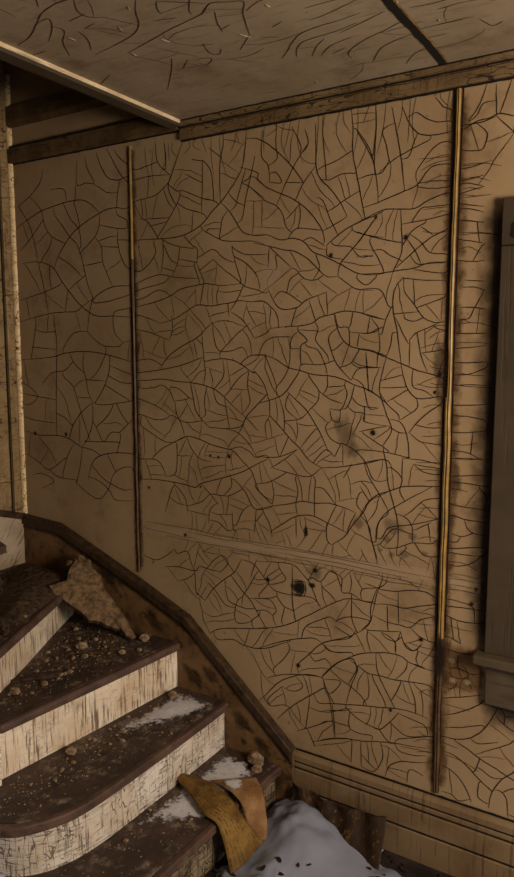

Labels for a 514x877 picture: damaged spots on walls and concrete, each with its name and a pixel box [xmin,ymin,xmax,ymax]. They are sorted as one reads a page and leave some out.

crack [18,0,262,87]
crack [272,0,503,65]
crack [463,80,514,151]
crack [18,93,514,817]